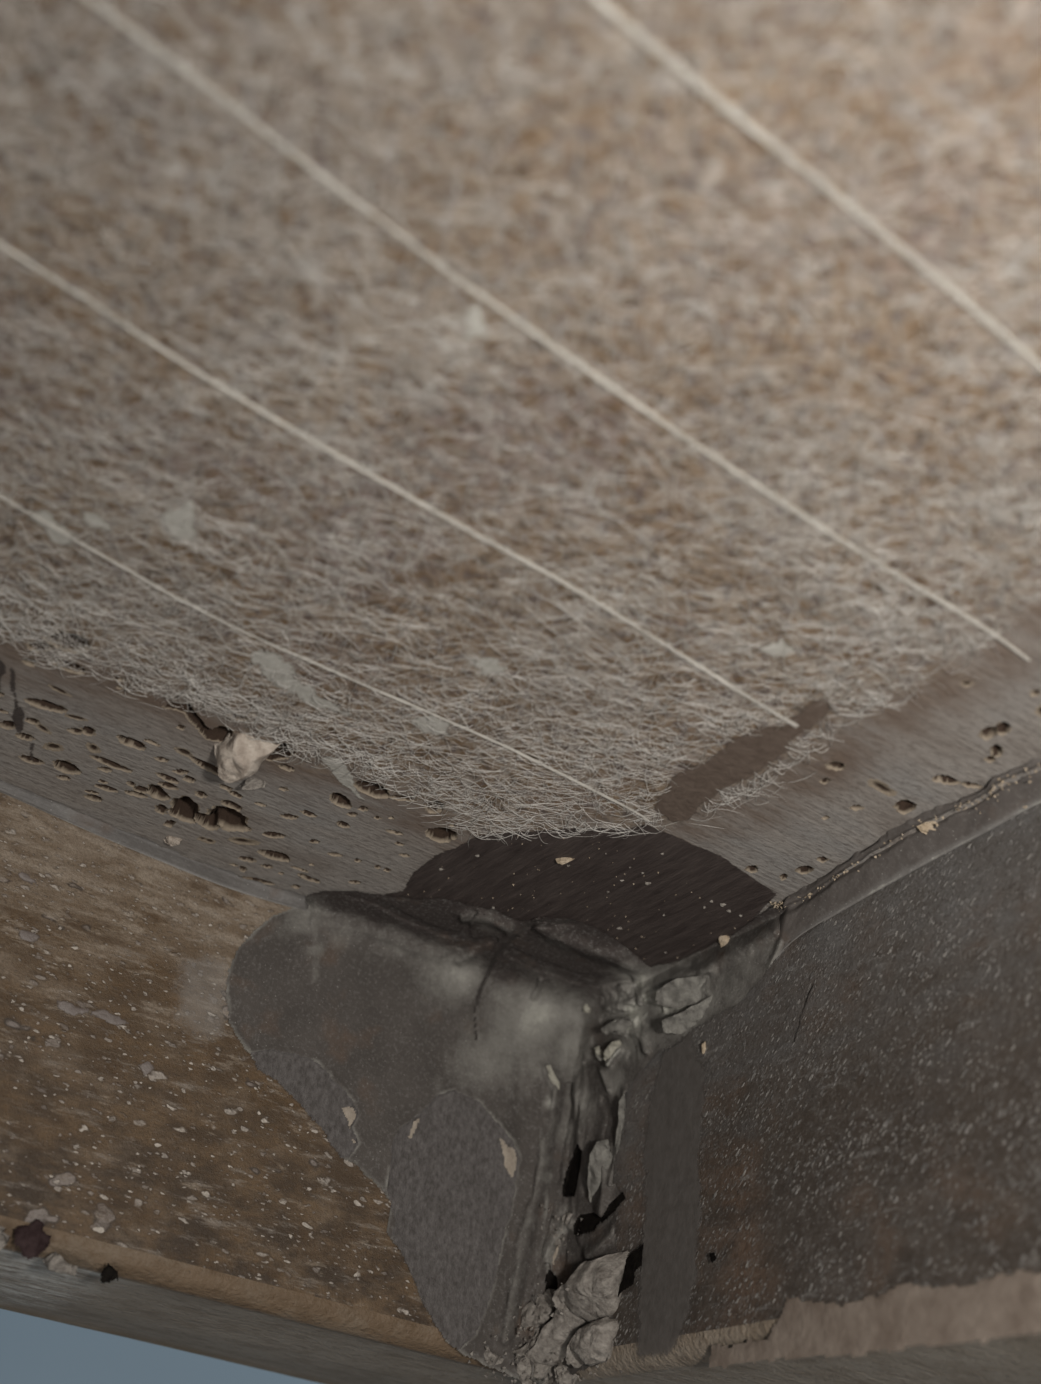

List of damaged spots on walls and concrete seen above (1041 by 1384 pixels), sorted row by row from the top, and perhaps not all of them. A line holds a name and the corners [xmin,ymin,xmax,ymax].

spalling [22,630,91,675]
spalling [0,684,458,889]
damp [386,699,830,967]
spalling [0,1219,78,1275]
spalling [100,1263,119,1283]